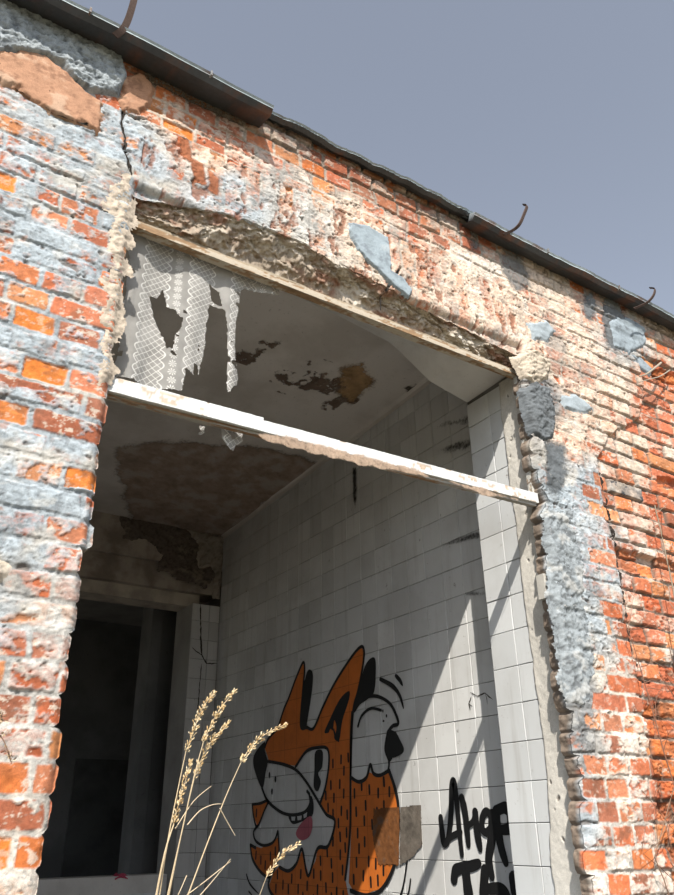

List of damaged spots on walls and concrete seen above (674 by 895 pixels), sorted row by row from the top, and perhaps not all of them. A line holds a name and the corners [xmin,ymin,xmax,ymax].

peeling [0,0,155,136]
crack [120,107,145,175]
peeling [348,223,412,300]
peeling [609,317,674,386]
peeling [560,394,593,415]
peeling [259,433,428,477]
peeling [451,481,518,500]
spalling [119,516,215,589]